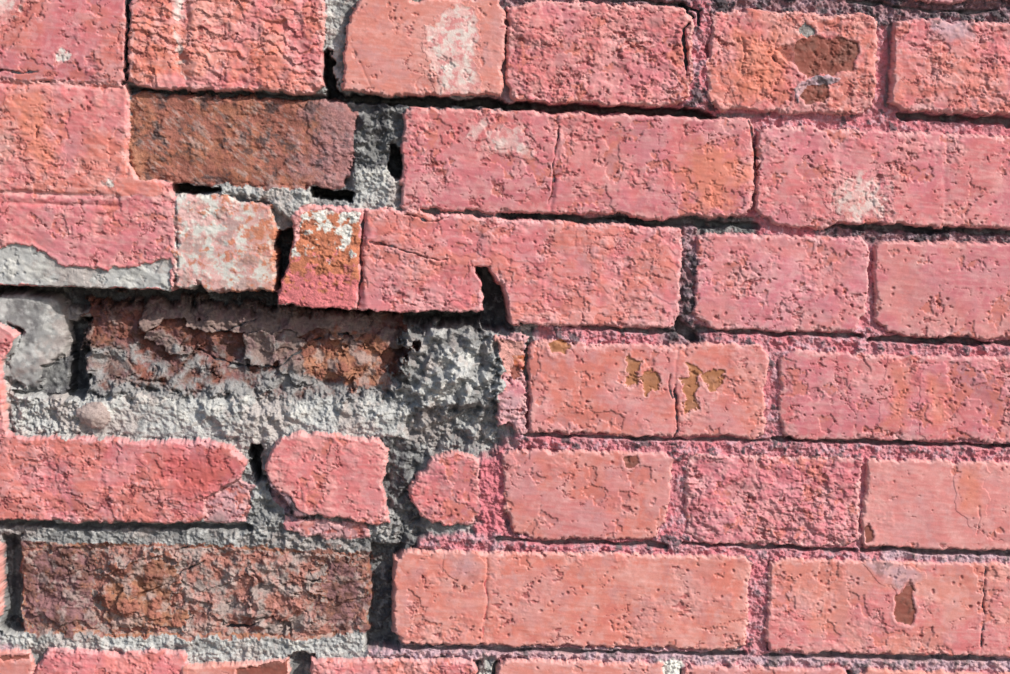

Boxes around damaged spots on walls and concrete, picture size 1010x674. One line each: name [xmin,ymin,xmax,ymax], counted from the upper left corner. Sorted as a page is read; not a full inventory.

peeling [0,0,29,31]
peeling [54,46,72,63]
peeling [169,0,191,81]
peeling [794,22,859,105]
crack [548,128,559,202]
crack [748,90,777,201]
spalling [0,90,422,442]
peeling [625,355,662,397]
peeling [679,362,725,414]
spalling [0,527,384,661]
peeling [894,585,916,625]
peeling [236,659,289,674]